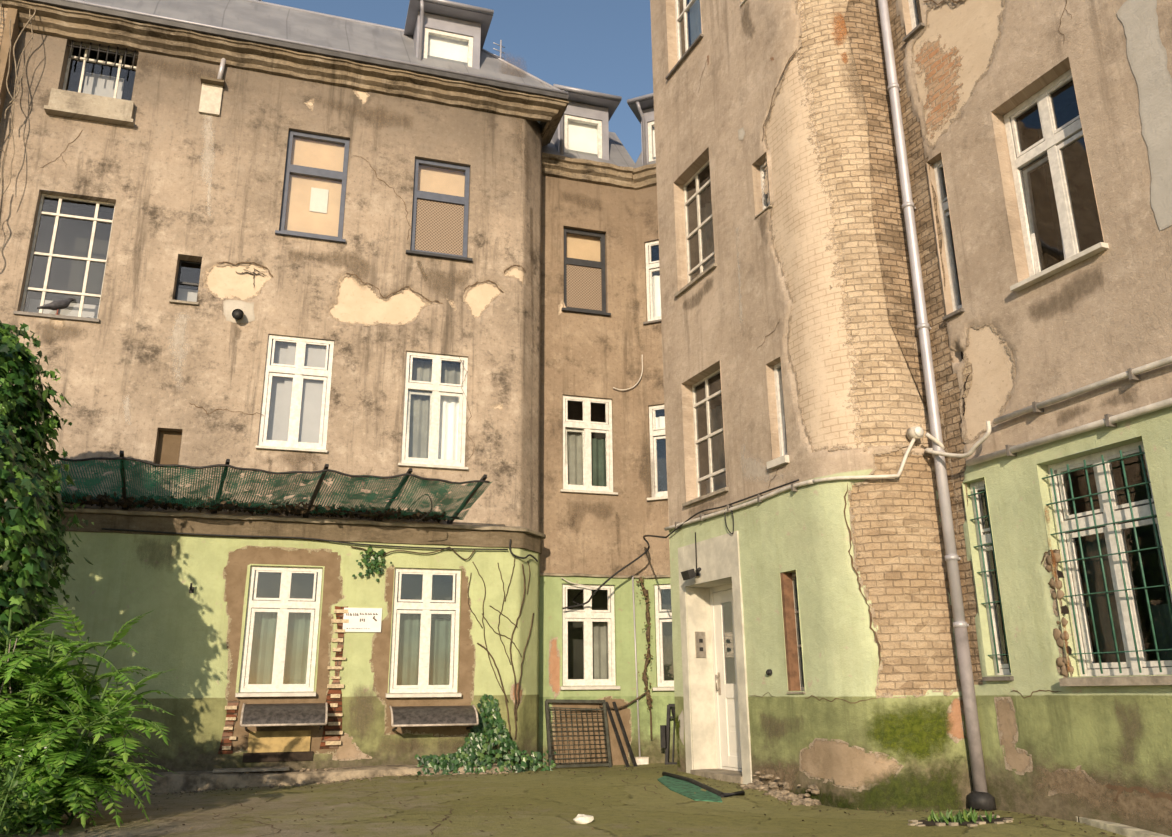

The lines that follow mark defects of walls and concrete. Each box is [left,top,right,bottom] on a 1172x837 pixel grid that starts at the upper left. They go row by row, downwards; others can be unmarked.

flaking render [203,262,273,301]
flaking render [329,265,526,327]
flaking render [764,0,1016,743]
water stain [759,762,798,792]
flaking render [799,738,904,792]
flaking render [994,697,1033,775]